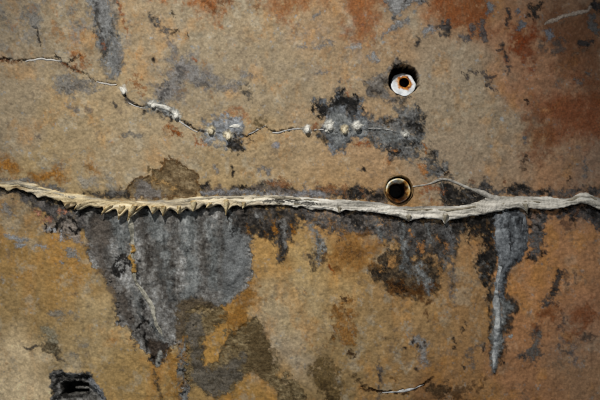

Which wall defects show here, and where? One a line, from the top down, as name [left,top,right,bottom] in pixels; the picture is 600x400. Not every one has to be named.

crack [0,54,410,155]
crack [0,178,600,224]
damp [311,58,600,206]
damp [125,212,164,340]
peeling [43,205,307,400]
damp [226,205,548,374]